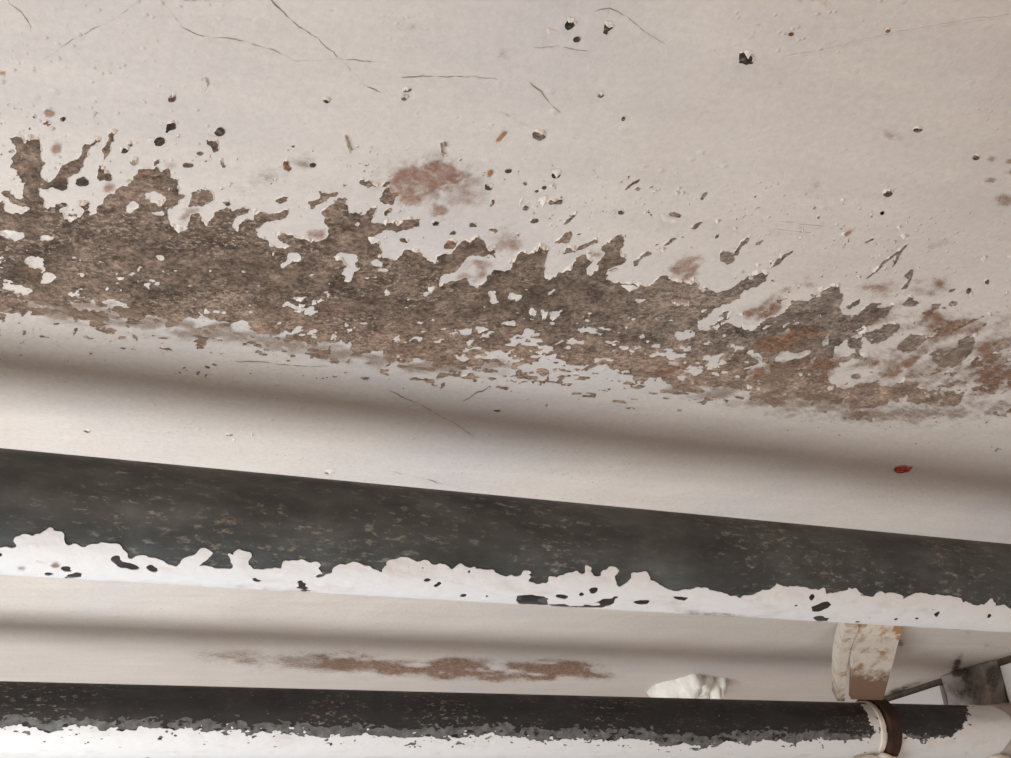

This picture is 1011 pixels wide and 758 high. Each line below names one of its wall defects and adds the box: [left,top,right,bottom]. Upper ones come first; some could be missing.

peeling [0,103,1011,430]
spalling [45,566,82,577]
spalling [111,555,158,572]
spalling [517,587,618,608]
spalling [809,594,831,621]
rust [280,655,608,681]